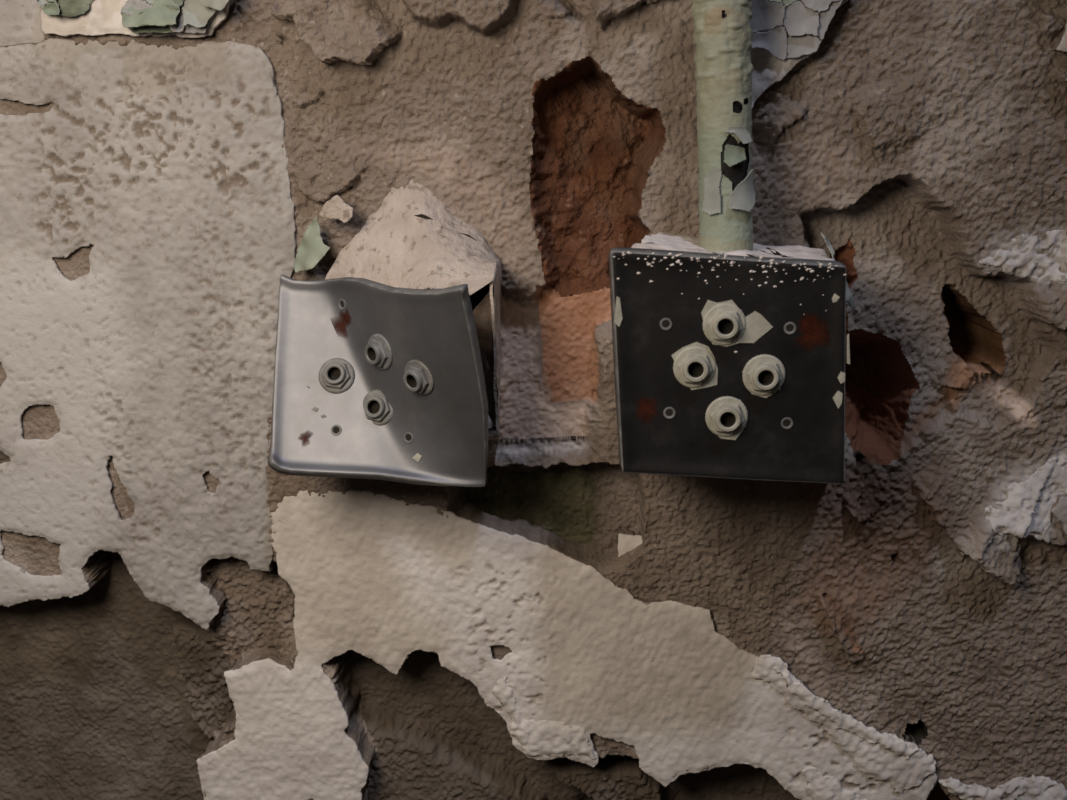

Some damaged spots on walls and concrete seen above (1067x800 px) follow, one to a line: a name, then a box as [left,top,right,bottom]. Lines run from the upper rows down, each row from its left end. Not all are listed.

peeling [37,0,94,17]
peeling [120,0,235,34]
peeling [750,0,843,60]
spalling [529,56,666,403]
flaking render [801,177,1052,465]
flaking render [0,550,296,800]
flaking render [324,650,800,800]
flaking render [927,783,950,800]